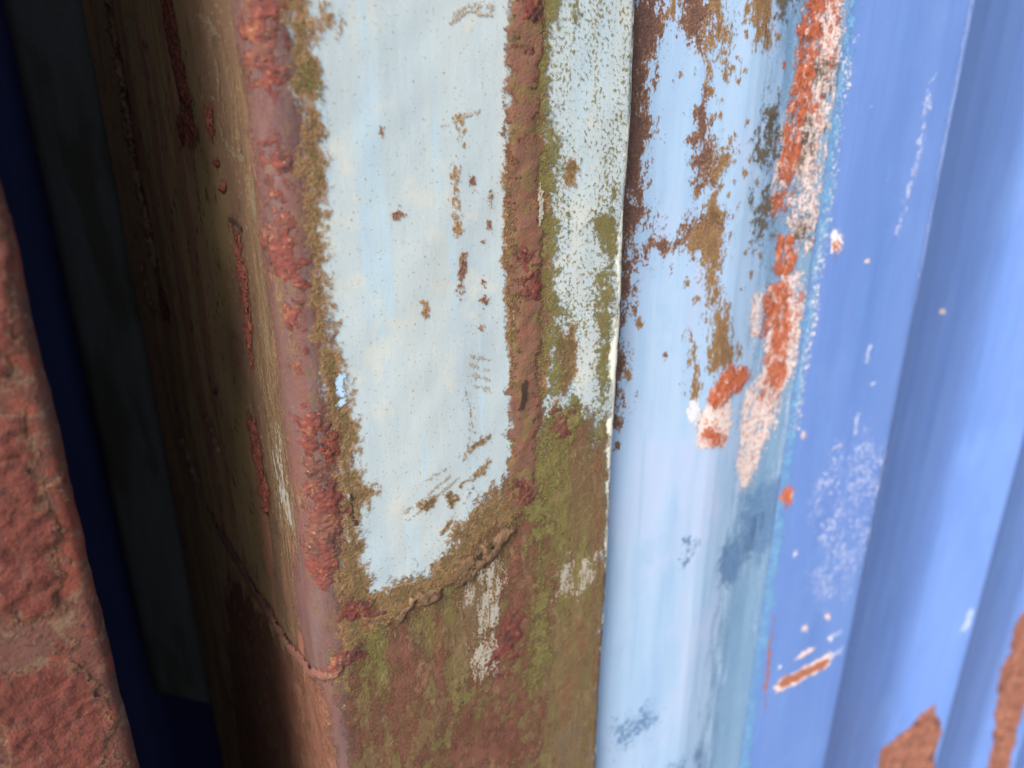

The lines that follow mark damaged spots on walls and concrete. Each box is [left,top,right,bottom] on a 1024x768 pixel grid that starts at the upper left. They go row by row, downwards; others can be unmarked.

peeling [623,41,633,186]
peeling [685,0,846,591]
rust [218,0,782,768]
peeling [604,210,623,567]
peeling [678,535,701,571]
rust [777,658,830,689]
rust [878,703,942,768]
rust [988,612,1024,768]